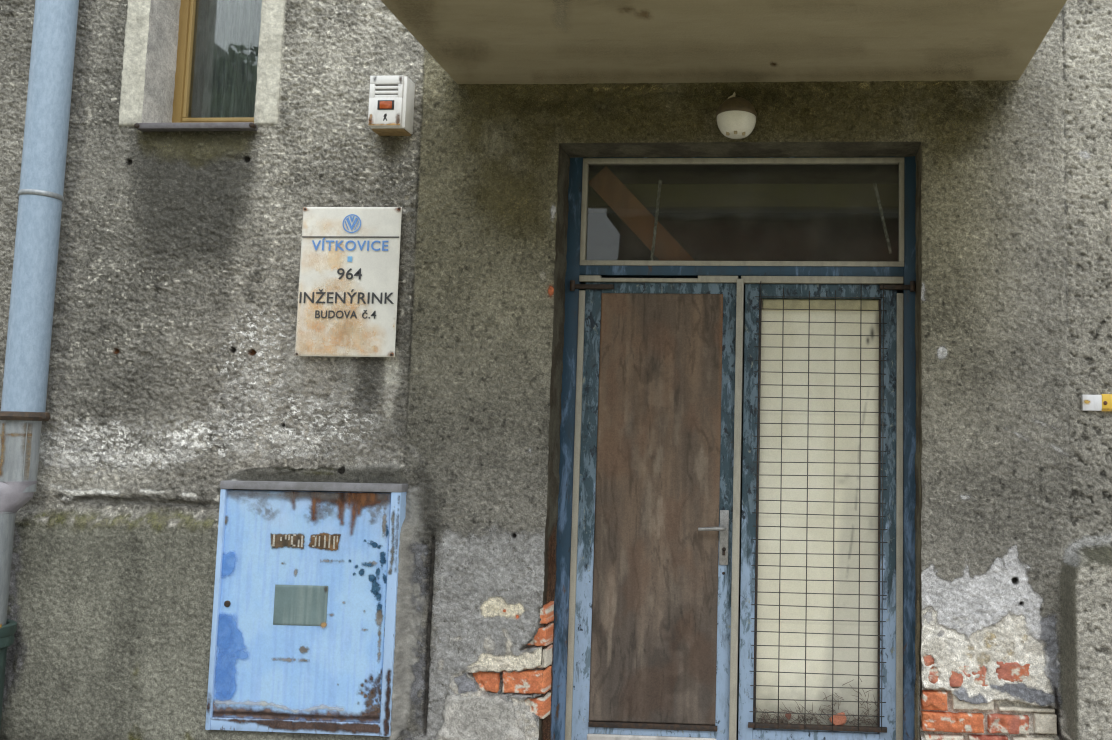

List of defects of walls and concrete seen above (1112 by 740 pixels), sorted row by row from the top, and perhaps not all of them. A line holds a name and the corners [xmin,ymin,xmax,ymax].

damp [133,131,253,252]
peeling [405,525,554,740]
peeling [914,545,1070,740]